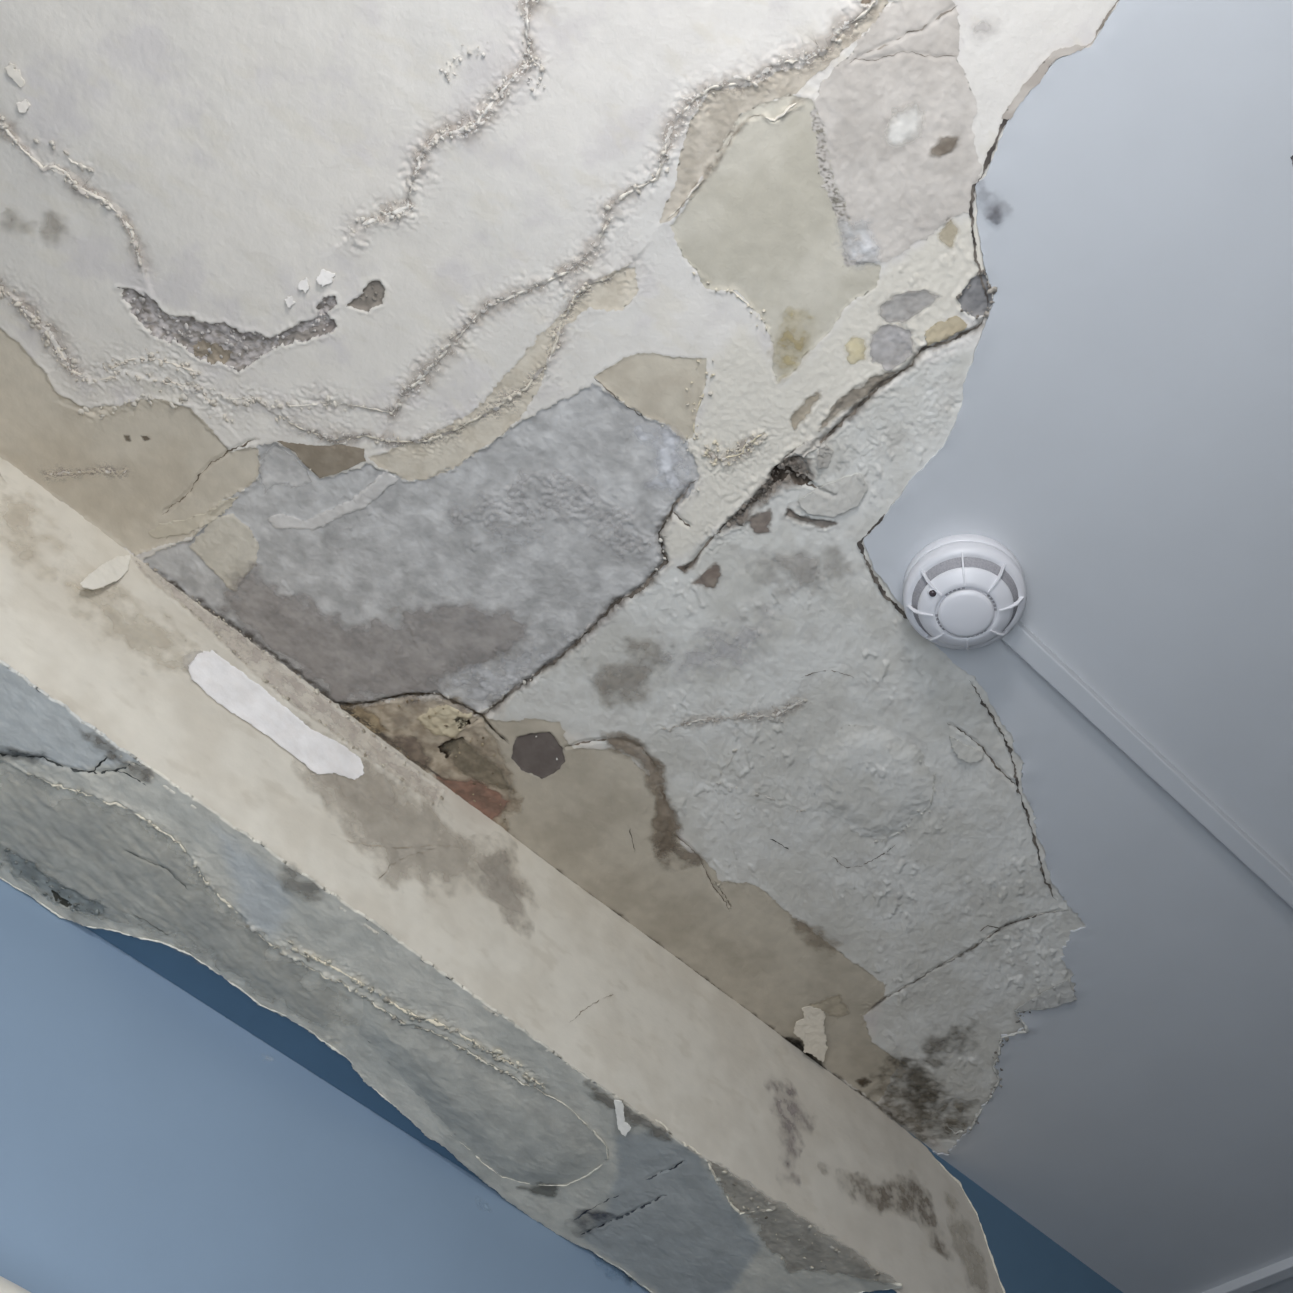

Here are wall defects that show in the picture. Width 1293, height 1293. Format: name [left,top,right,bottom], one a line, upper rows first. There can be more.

crack [344,119,1009,741]
peeling [172,588,194,611]
crack [0,749,148,787]
crack [863,681,1069,1014]
peeling [0,650,903,1293]
damp [774,1084,799,1165]
damp [857,1031,967,1141]